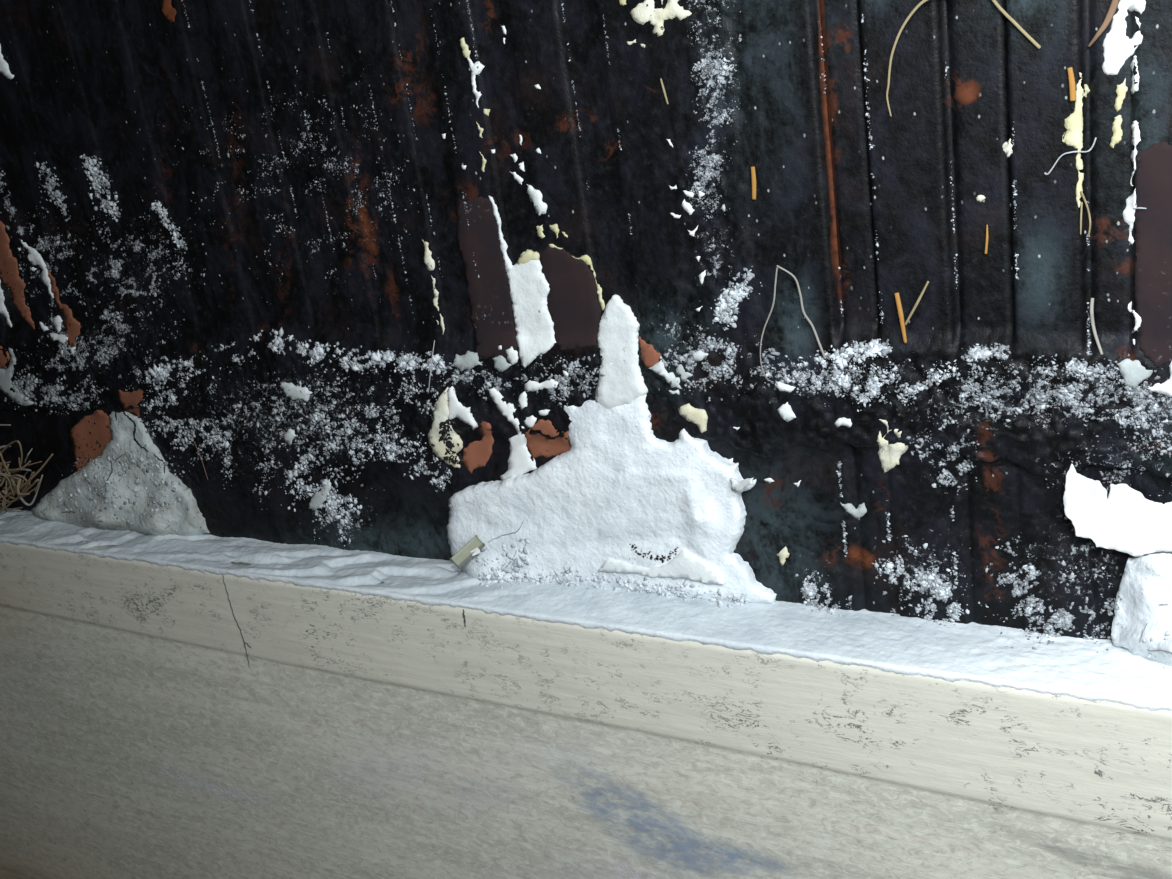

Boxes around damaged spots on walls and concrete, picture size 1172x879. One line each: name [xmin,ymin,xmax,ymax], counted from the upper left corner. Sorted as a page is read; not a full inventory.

damp [0,154,606,550]
damp [186,64,435,281]
peeling [456,197,518,365]
flaking render [518,392,571,460]
peeling [539,224,602,351]
corrosion [819,0,839,266]
damp [660,266,1172,521]
peeling [1110,115,1172,369]
crack [223,576,251,667]
damp [795,569,852,617]
damp [872,500,1126,653]
peeling [1063,464,1172,557]